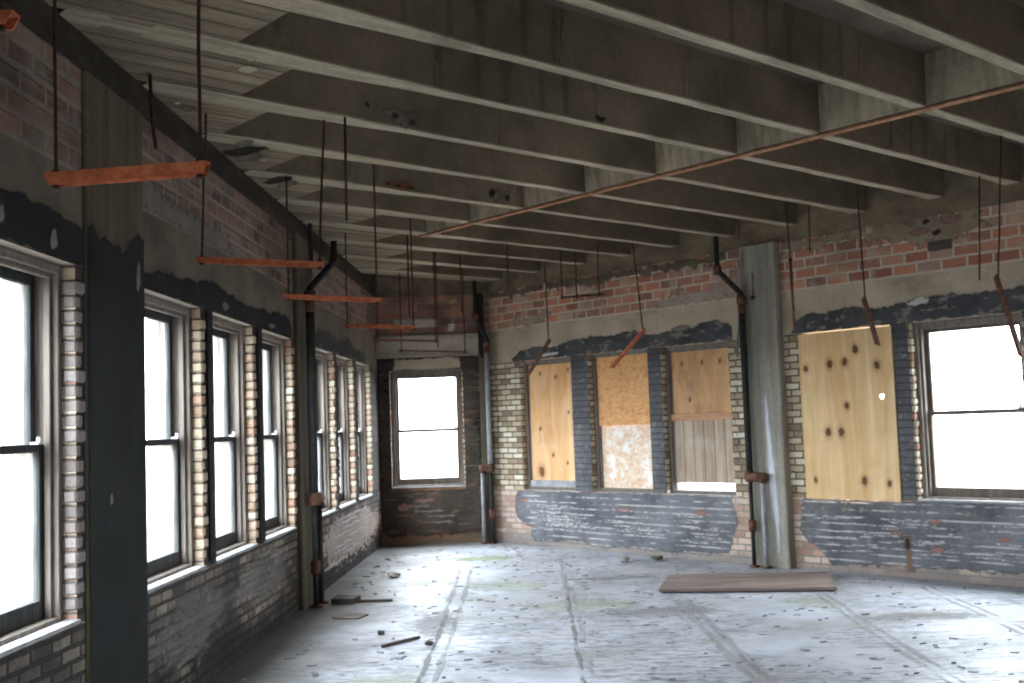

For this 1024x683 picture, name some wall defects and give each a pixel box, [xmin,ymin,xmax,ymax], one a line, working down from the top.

corrosion [418,83,1024,237]
peeling [0,188,83,265]
spalling [910,229,952,251]
peeling [136,260,291,338]
peeling [512,320,738,555]
peeling [791,286,1024,574]
peeling [323,503,381,571]